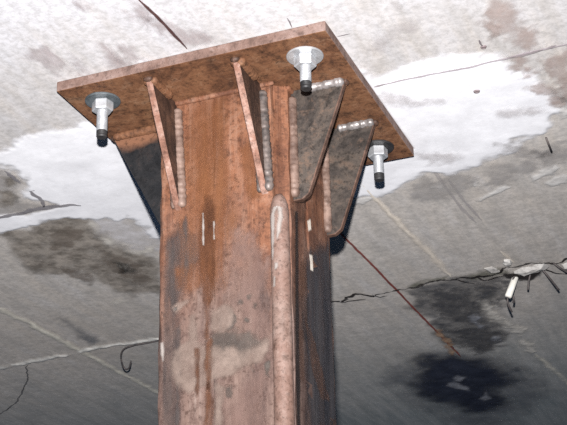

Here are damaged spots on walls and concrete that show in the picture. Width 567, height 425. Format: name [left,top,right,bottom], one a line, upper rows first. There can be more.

crack [0,171,81,218]
damp [0,217,160,293]
corrosion [200,198,215,304]
crack [331,258,567,303]
damp [409,270,527,352]
spalling [484,259,549,281]
crack [0,365,29,414]
corrosion [196,333,211,419]